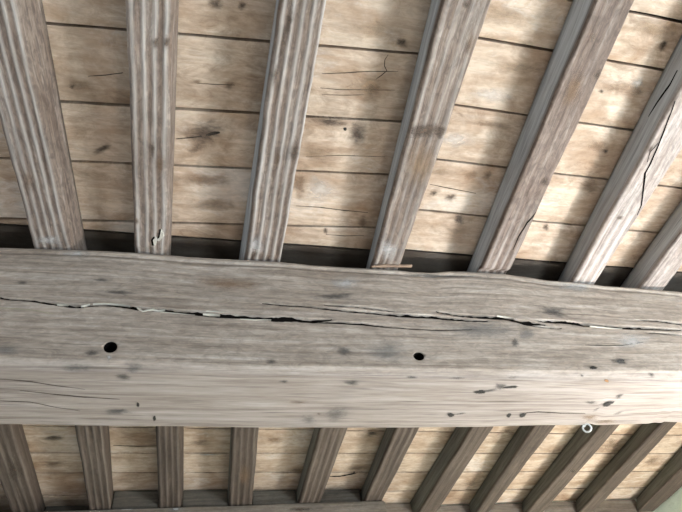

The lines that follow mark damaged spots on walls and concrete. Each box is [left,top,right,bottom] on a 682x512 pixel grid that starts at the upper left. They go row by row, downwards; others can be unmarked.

crack [323,55,398,96]
crack [637,70,678,215]
crack [0,297,681,346]